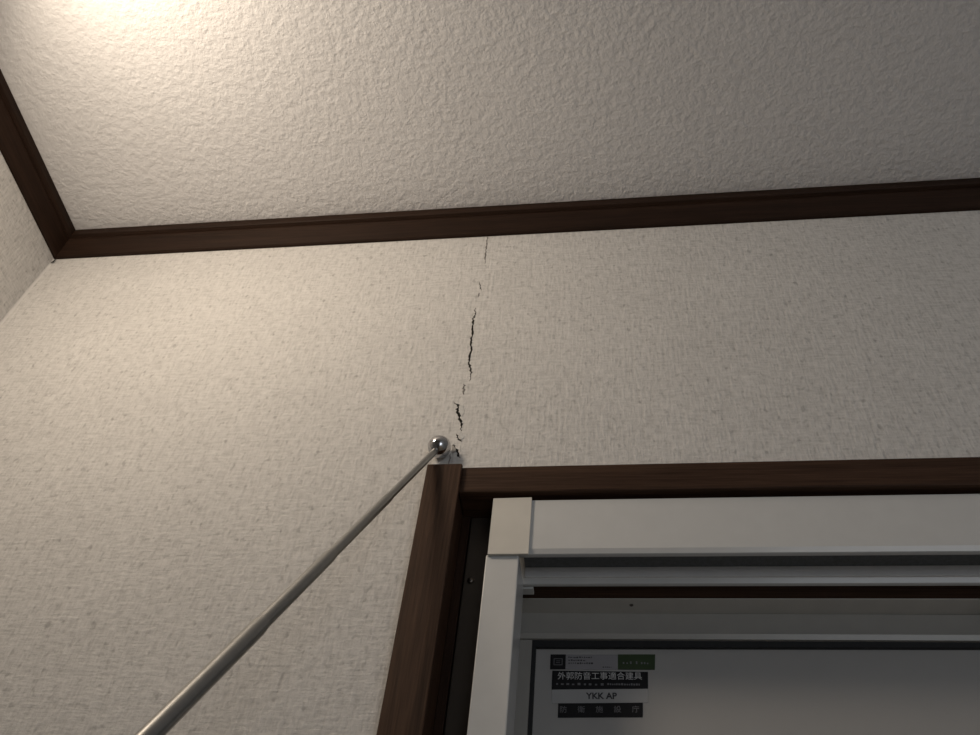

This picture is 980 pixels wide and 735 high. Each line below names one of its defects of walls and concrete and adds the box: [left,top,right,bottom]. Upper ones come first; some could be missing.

crack [448,236,488,464]